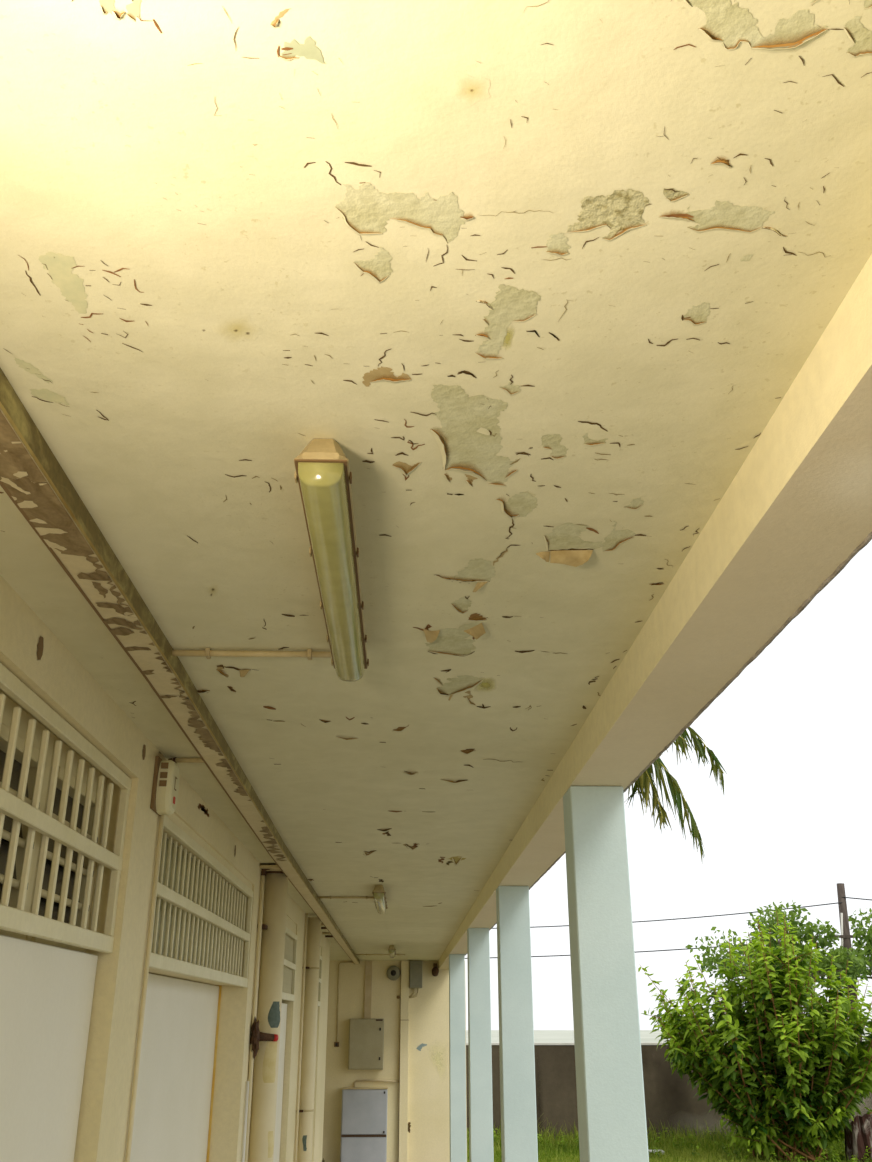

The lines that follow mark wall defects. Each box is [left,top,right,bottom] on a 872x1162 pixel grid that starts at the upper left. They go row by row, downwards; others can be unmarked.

peeling [99,0,141,22]
peeling [277,36,325,64]
peeling [671,0,872,66]
peeling [304,161,474,284]
peeling [532,189,651,261]
peeling [659,188,787,237]
peeling [455,267,559,361]
peeling [343,349,421,387]
peeling [578,421,635,460]
peeling [391,371,568,706]
peeling [536,520,652,567]
peeling [0,471,251,801]